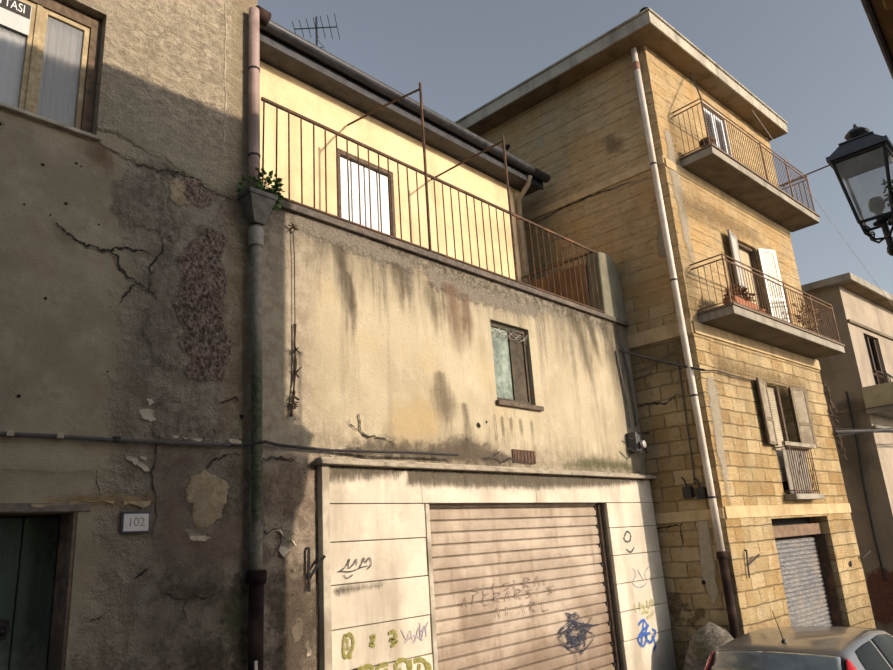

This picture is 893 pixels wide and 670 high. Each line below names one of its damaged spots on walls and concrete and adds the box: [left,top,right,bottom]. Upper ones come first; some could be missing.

crack [99,143,232,204]
flaking render [168,176,192,207]
crack [536,177,647,223]
crack [55,223,164,303]
flaking render [173,226,233,386]
flaking render [124,454,150,472]
flaking render [184,468,231,541]